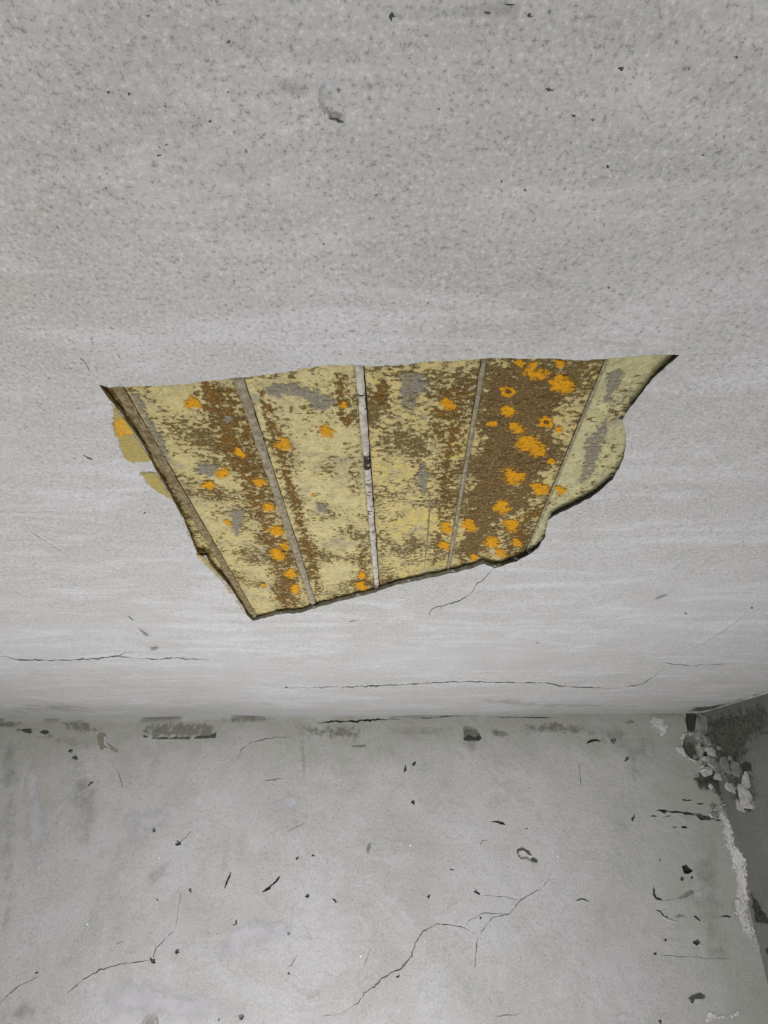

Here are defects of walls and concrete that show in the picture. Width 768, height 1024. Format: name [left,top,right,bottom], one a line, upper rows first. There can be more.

spalling [619,355,679,420]
spalling [100,385,545,621]
spalling [548,446,626,520]